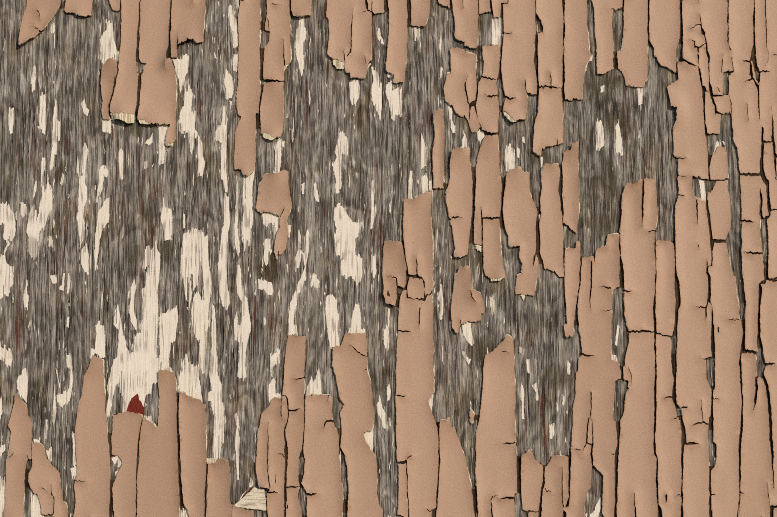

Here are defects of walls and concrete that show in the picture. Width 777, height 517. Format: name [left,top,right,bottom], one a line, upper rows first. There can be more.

crack [108,0,144,119]
crack [256,0,296,130]
crack [459,0,581,136]
peeling [496,0,682,257]
peeling [0,0,582,517]
crack [388,239,434,332]
crack [447,166,506,259]
peeling [611,288,629,366]
crack [512,0,777,517]
crack [176,389,188,510]
crack [266,376,329,517]
crack [472,392,637,517]